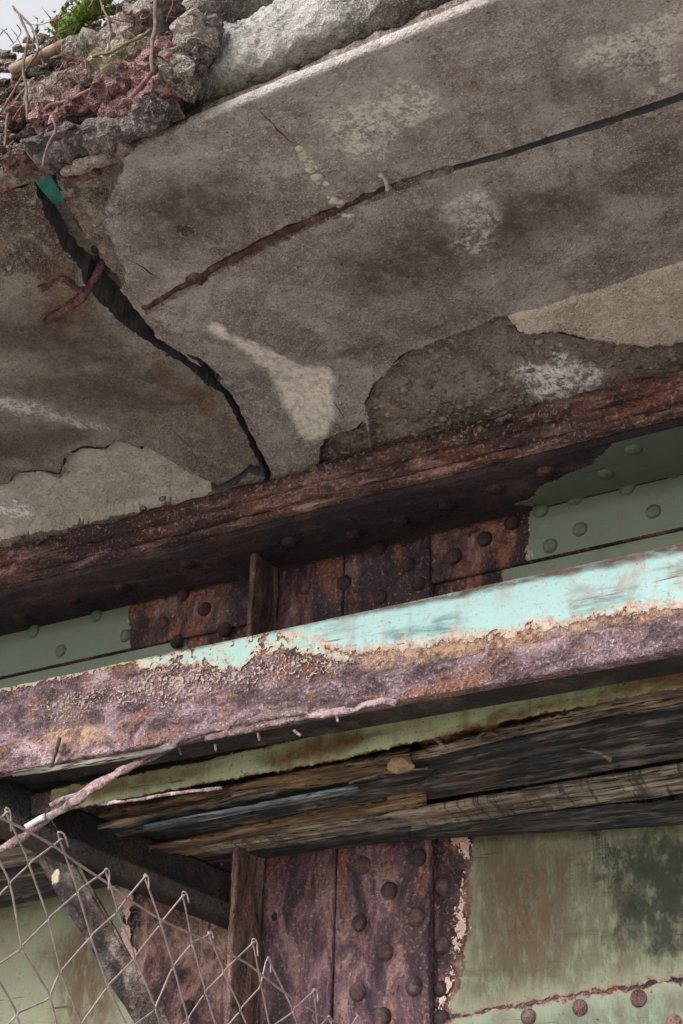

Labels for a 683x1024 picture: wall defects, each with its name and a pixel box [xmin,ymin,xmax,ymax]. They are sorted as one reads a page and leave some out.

crack [453,92,683,171]
crack [34,176,271,491]
efflorescence [207,322,335,440]
spalling [255,261,683,492]
crack [1,440,144,484]
peeling [0,426,683,729]
corrosion [360,621,599,669]
corrosion [330,543,683,619]
corrosion [613,608,683,622]
peeling [50,673,683,811]
peeling [434,825,683,1024]
mould [590,831,683,954]